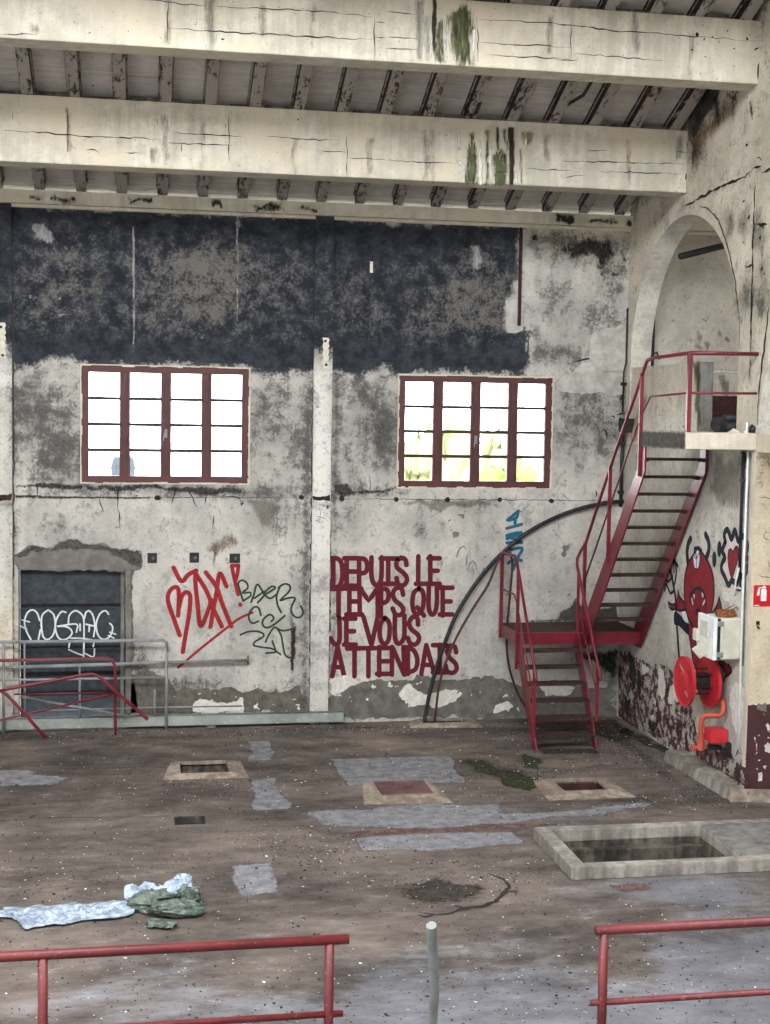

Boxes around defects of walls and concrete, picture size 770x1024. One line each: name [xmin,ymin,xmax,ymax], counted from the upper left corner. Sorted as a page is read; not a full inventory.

crack [6,110,240,154]
water stain [677,89,738,164]
crack [268,136,455,173]
water stain [254,202,284,212]
water stain [556,213,574,225]
water stain [471,246,482,268]
water stain [561,237,626,276]
crack [500,141,770,425]
spalling [722,584,742,618]
flaking render [131,671,309,715]
flaking render [328,650,770,793]